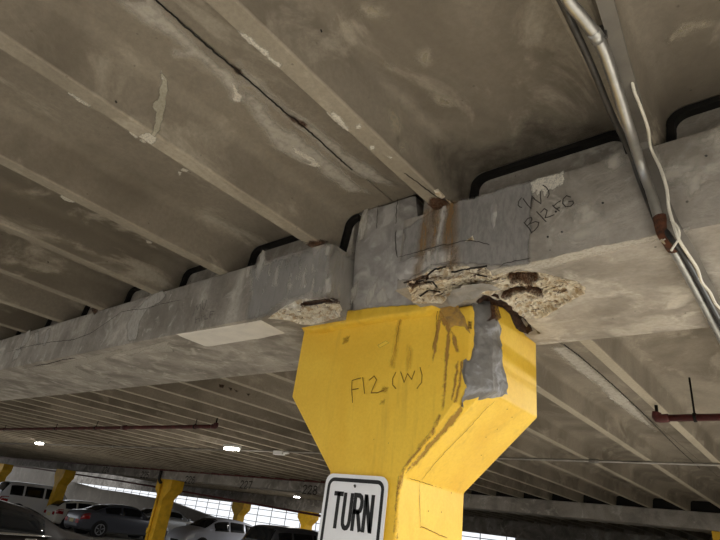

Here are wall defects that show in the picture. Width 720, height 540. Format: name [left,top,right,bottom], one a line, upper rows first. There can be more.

crack [155,0,353,170]
leakage [125,0,389,191]
corrosion [415,202,456,278]
spalling [268,298,343,325]
corrosion [487,300,501,321]
spalling [395,265,586,510]
crack [554,344,700,468]